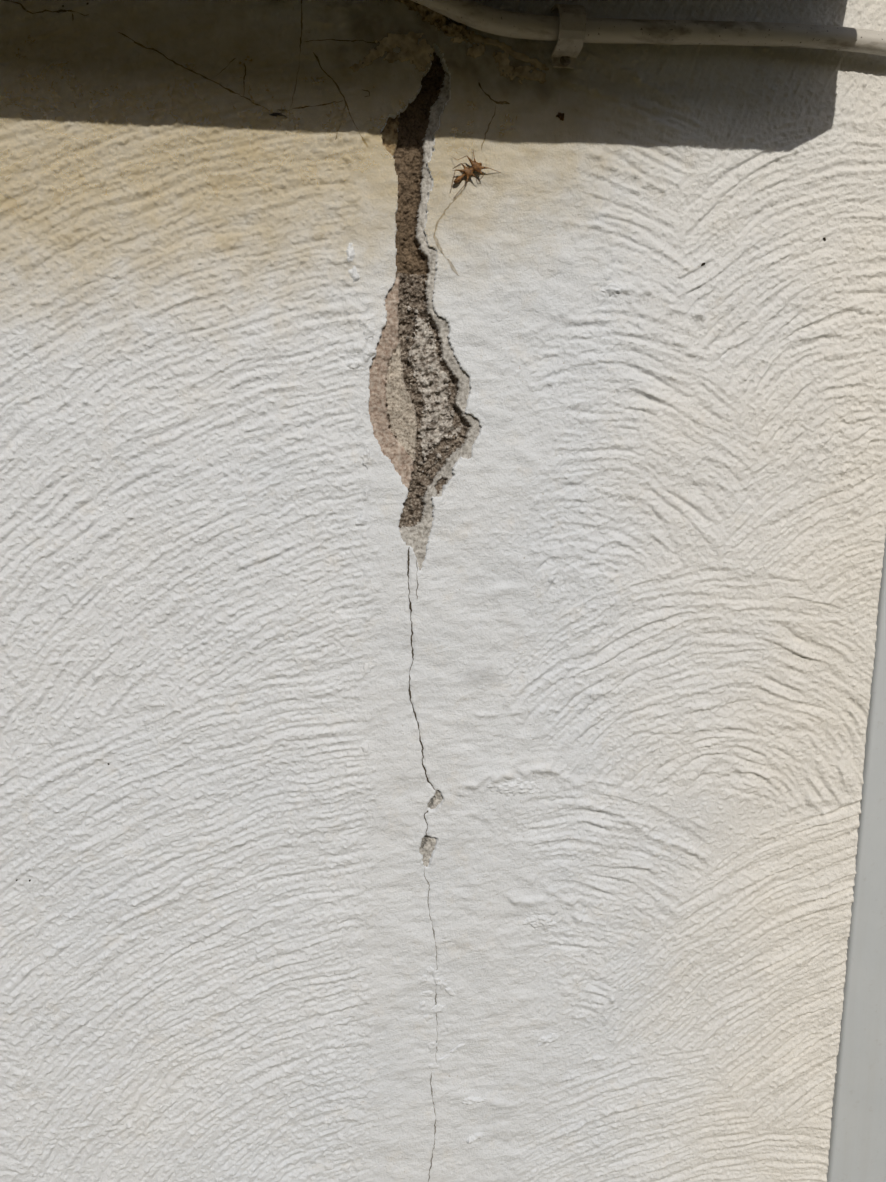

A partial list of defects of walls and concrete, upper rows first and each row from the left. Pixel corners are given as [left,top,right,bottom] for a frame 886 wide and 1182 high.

crack [4,0,89,21]
crack [117,0,467,300]
peeling [349,31,435,77]
crack [478,82,510,149]
flaking render [347,272,481,571]
crack [407,548,435,835]
crack [424,869,438,1181]